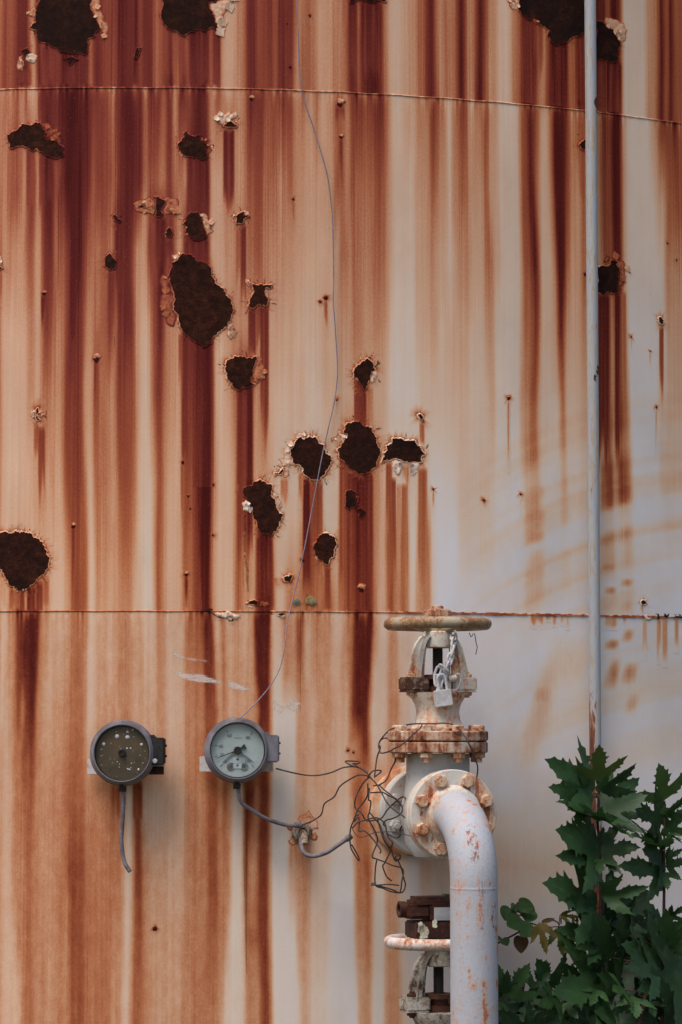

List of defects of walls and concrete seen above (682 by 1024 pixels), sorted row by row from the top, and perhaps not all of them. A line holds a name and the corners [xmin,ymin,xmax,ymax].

corrosion [243,0,315,280]
corrosion [334,35,387,290]
corrosion [515,13,624,460]
corrosion [596,0,622,23]
corrosion [0,0,213,1024]
corrosion [602,421,629,510]
corrosion [235,500,376,976]
corrosion [243,772,271,1024]